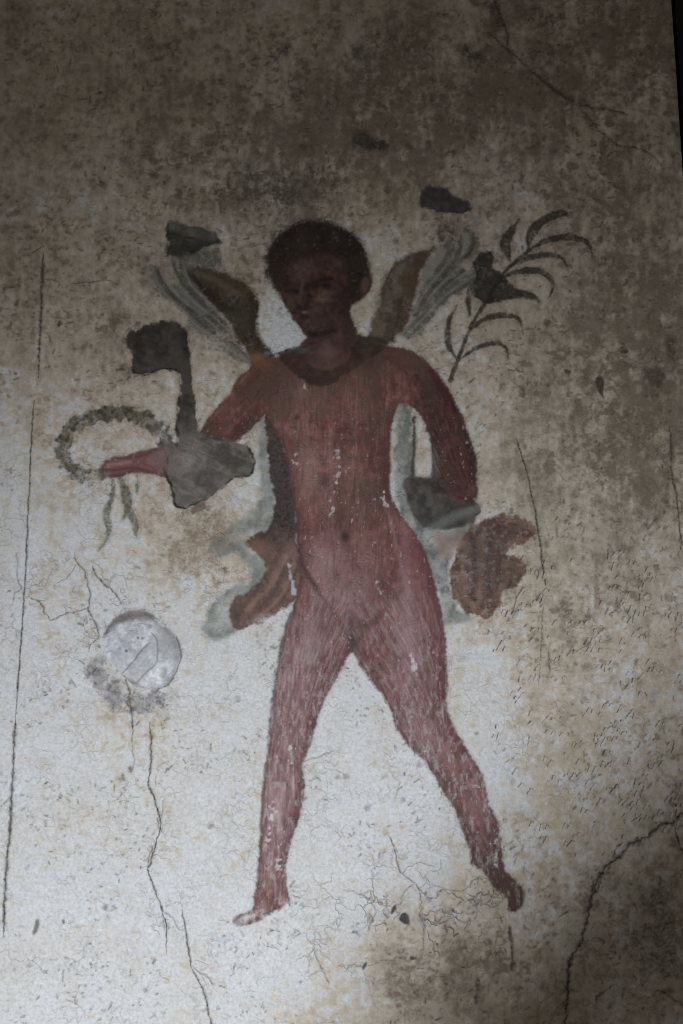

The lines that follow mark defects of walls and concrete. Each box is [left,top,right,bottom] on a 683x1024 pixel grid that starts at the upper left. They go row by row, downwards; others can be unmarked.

crack [484,0,661,165]
flaking render [163,218,224,258]
flaking render [418,183,474,215]
flaking render [114,318,257,510]
crack [121,632,214,1024]
crack [549,811,683,1024]